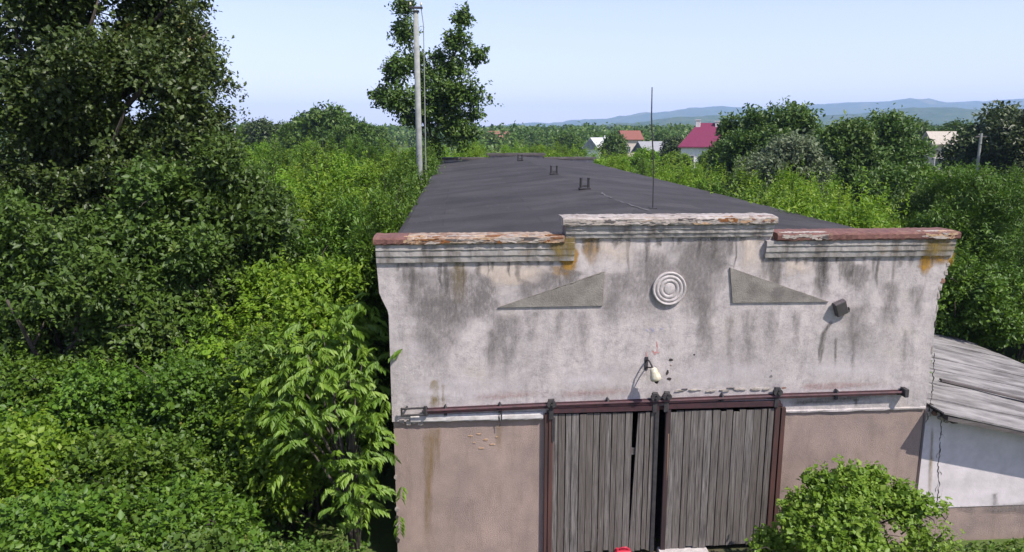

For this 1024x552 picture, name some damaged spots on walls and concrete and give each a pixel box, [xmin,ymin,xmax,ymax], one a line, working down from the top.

peeling [403,234,563,244]
corrosion [554,237,596,276]
corrosion [921,239,953,271]
peeling [916,230,959,239]
water stain [814,257,894,311]
water stain [398,262,497,352]